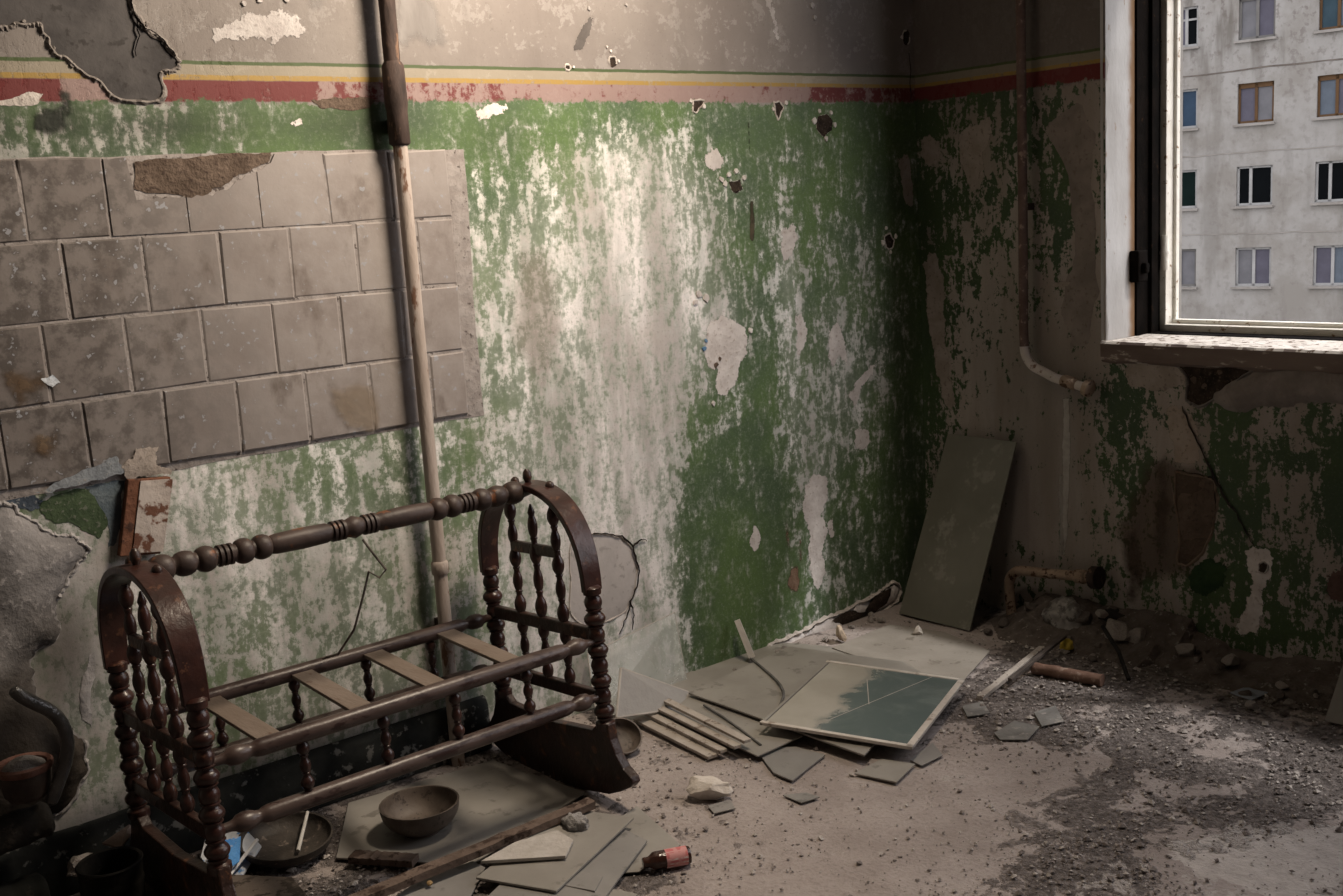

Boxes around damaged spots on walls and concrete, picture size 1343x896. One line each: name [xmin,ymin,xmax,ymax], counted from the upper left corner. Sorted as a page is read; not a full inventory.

flaking render [0,0,182,106]
peeling [211,0,306,45]
peeling [476,103,508,120]
flaking render [134,152,271,198]
peeling [704,147,747,193]
peeling [702,315,753,407]
peeling [6,446,172,547]
crack [1179,406,1254,545]
flaking render [569,532,638,625]
crack [592,533,647,634]
flaking render [767,580,902,646]
flaking render [1236,546,1274,635]